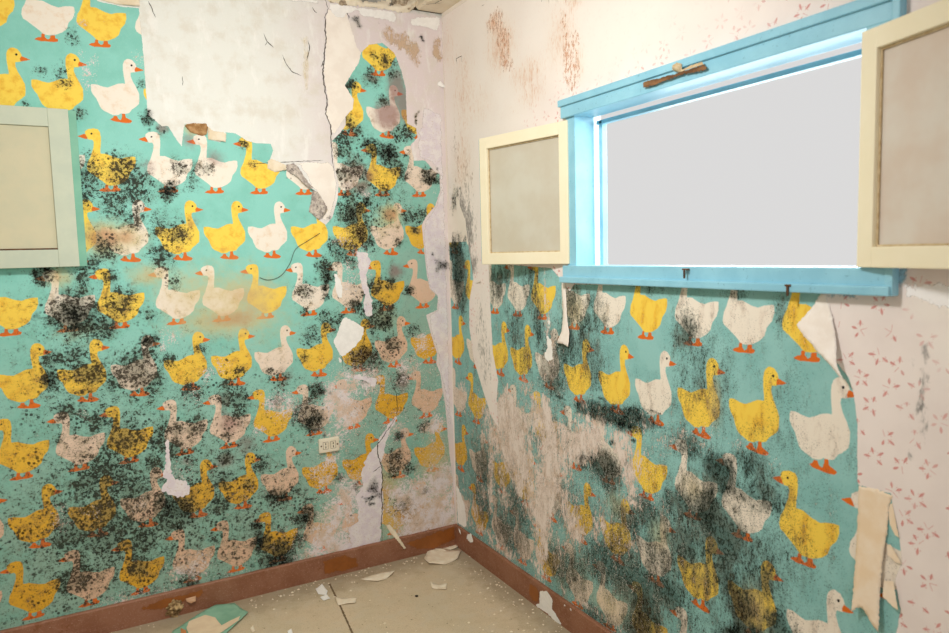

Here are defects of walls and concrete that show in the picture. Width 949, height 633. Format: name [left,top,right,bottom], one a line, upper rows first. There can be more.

crack [264,0,349,168]
peeling [324,0,418,133]
damp [384,27,441,63]
damp [364,140,407,162]
damp [341,189,371,246]
damp [432,234,467,289]
damp [49,290,112,335]
damp [574,398,661,443]
peeling [323,416,397,574]
damp [698,459,731,531]
damp [247,520,291,568]
peeling [883,581,898,610]